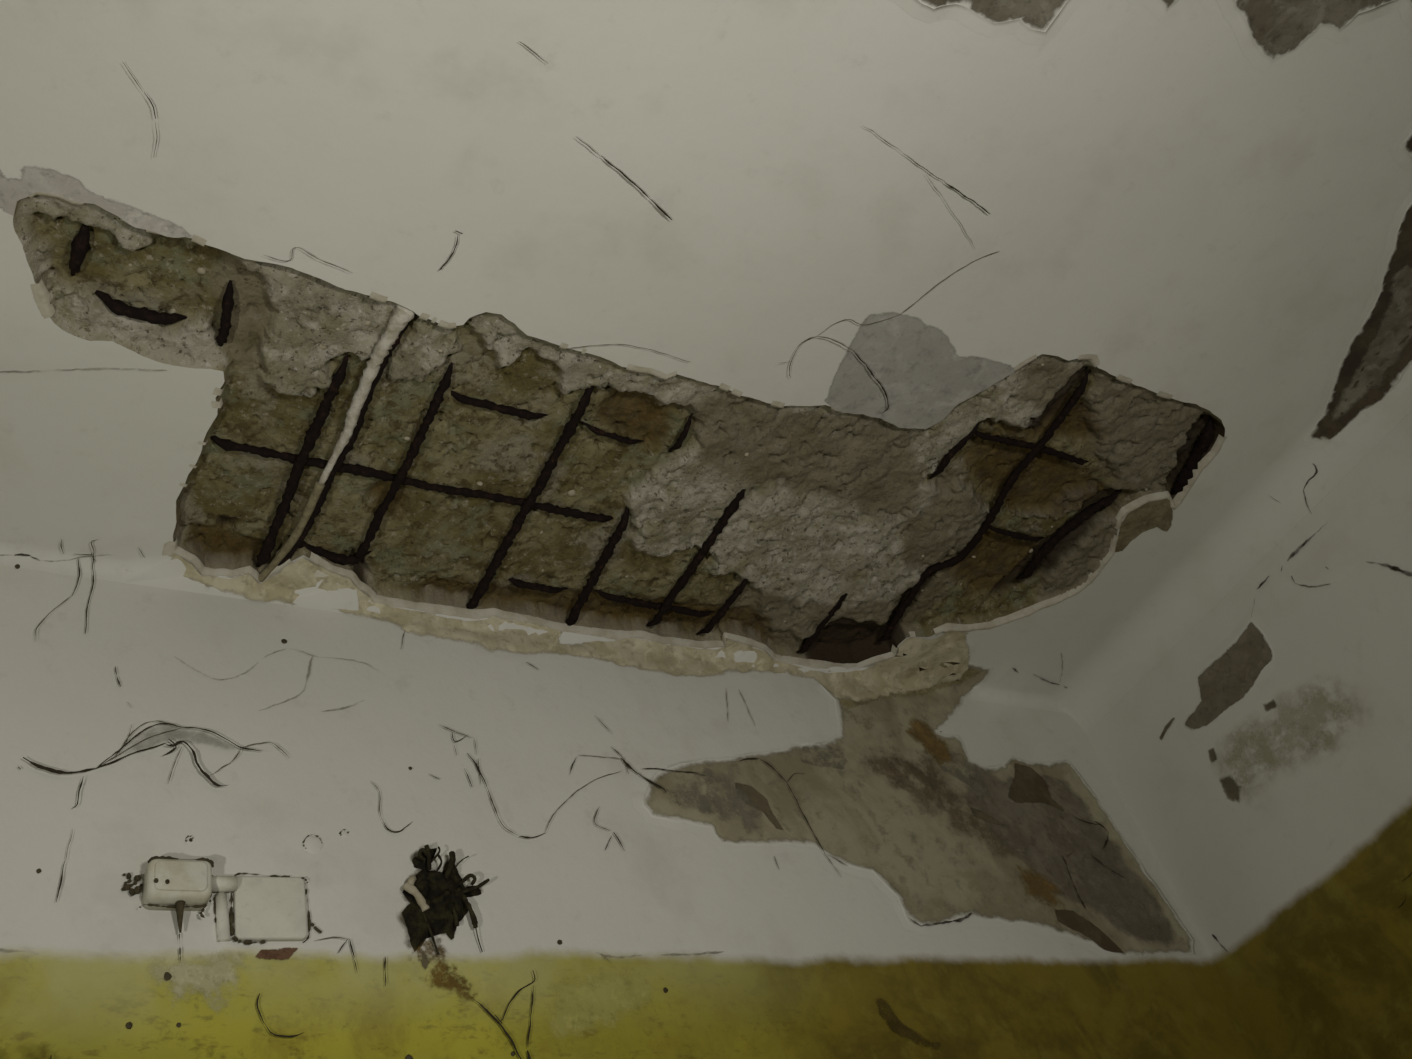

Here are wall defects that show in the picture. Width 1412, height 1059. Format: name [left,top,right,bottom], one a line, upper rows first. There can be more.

peeling [890,0,1084,46]
peeling [1216,0,1412,74]
spalling [0,167,1228,967]
crack [1380,564,1412,576]
peeling [1160,611,1282,740]
peeling [152,947,298,1009]